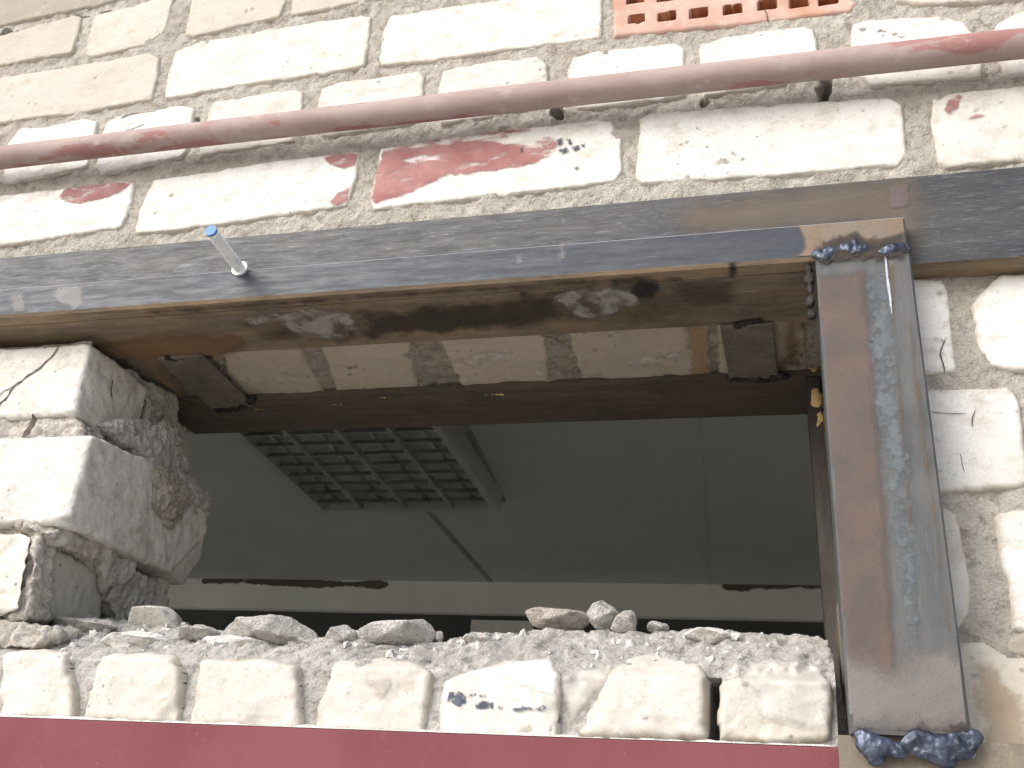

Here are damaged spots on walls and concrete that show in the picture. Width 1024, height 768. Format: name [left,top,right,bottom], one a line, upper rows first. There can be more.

crack [0,346,60,404]
rust [819,271,895,680]